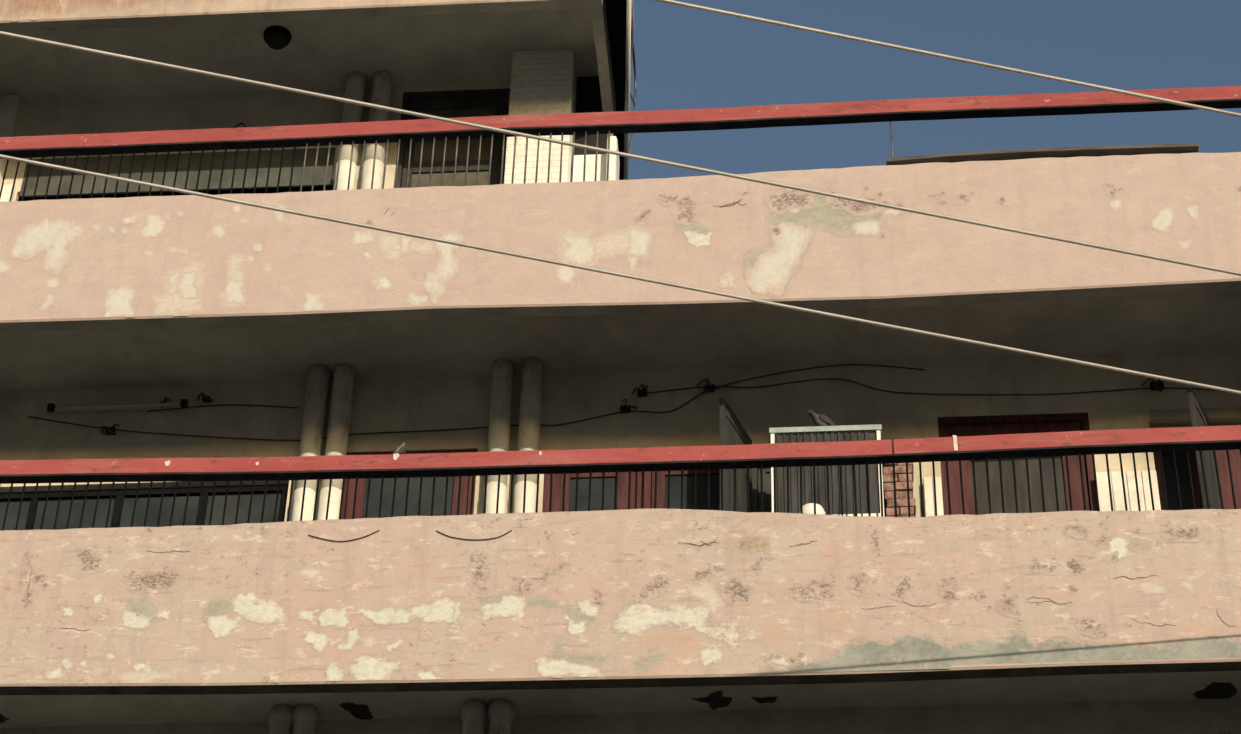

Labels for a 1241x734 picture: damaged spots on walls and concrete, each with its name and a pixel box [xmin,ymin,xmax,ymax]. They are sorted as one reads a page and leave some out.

peeling [0,204,275,317]
peeling [302,292,325,311]
peeling [352,228,464,307]
peeling [551,224,655,288]
peeling [717,183,919,299]
damp [1160,523,1203,543]
damp [1020,557,1087,595]
peeling [104,652,179,683]
peeling [201,592,462,681]
peeling [477,590,610,678]
peeling [612,583,740,667]
spalling [751,627,1241,674]